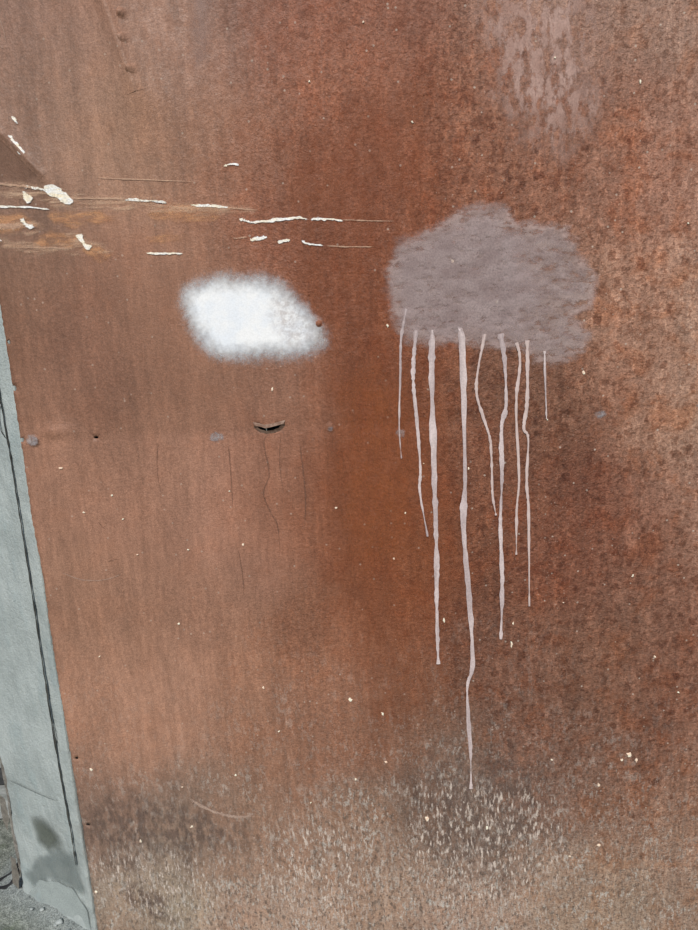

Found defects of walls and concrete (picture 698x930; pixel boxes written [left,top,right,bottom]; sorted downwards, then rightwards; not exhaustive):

peeling [44,184,73,204]
damp [108,854,229,920]
efflorescence [263,822,380,930]
efflorescence [404,781,564,926]